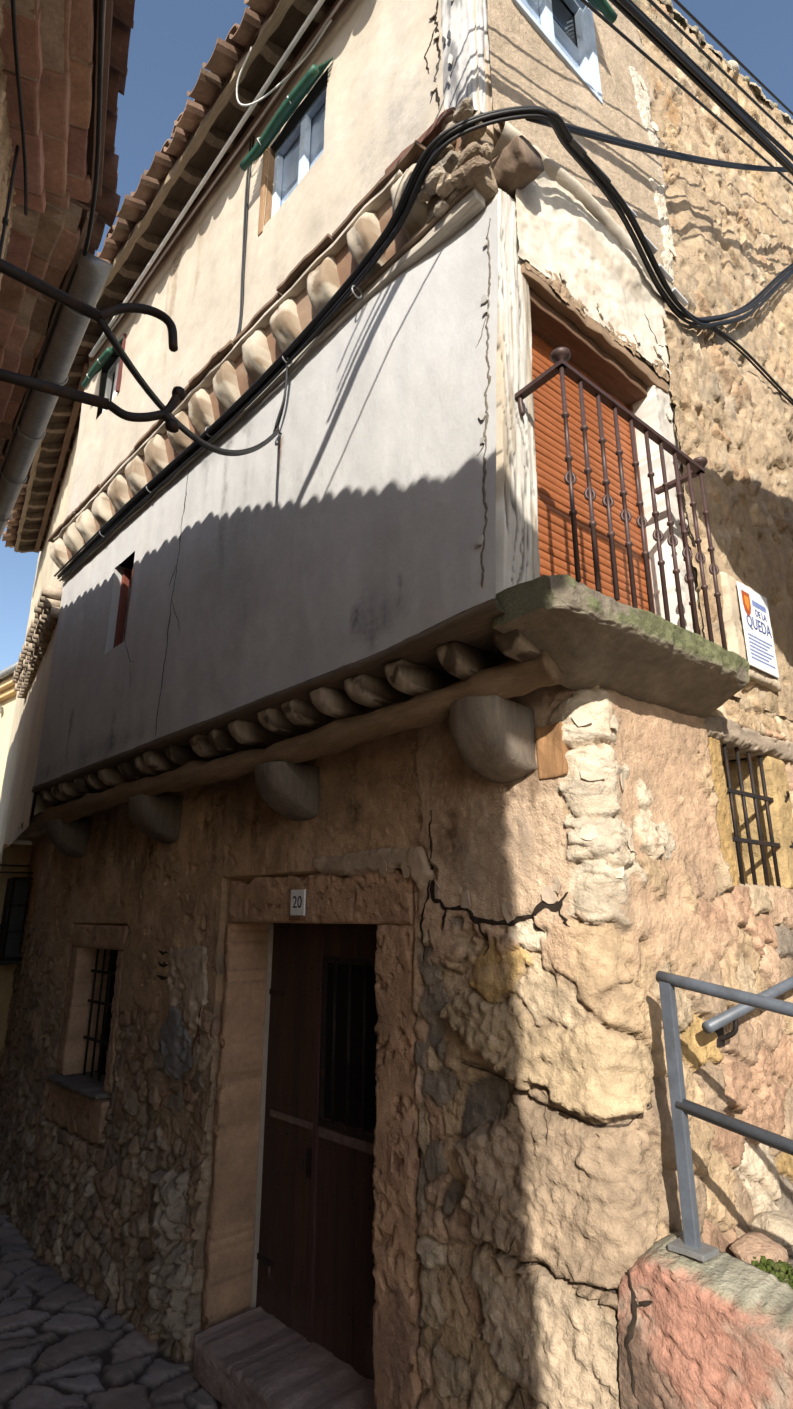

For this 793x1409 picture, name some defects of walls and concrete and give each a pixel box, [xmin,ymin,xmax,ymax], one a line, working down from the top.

peeling [442,30,453,83]
spalling [649,178,677,283]
spalling [525,260,670,381]
crack [420,810,570,964]